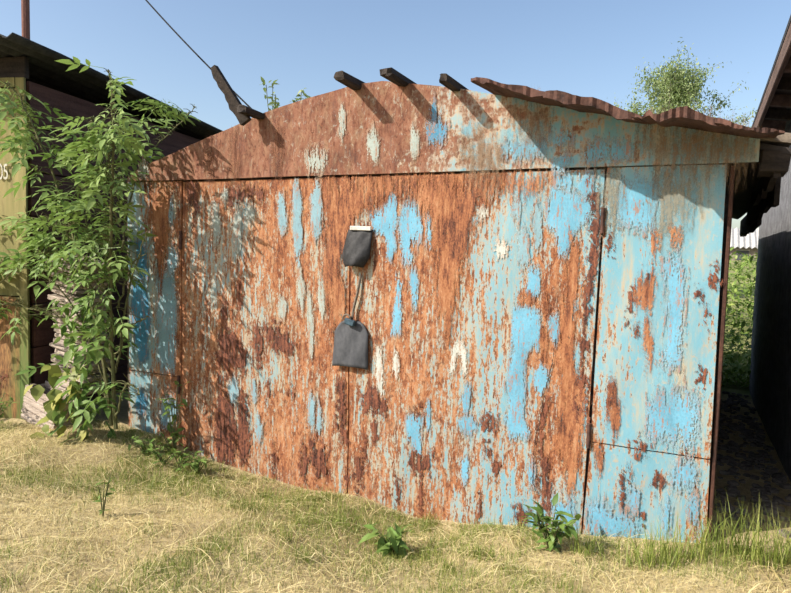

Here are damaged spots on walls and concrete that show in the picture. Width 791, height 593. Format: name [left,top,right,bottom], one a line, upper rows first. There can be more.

peeling [130,199,179,380]
rust [214,279,296,470]
peeling [276,142,328,362]
rust [333,367,391,496]
peeling [368,193,433,396]
rust [317,168,553,349]
rust [515,170,616,515]
peeling [493,122,660,447]
peeling [548,479,643,538]
rust [604,371,621,444]
rust [624,226,684,373]
peeling [644,243,705,537]